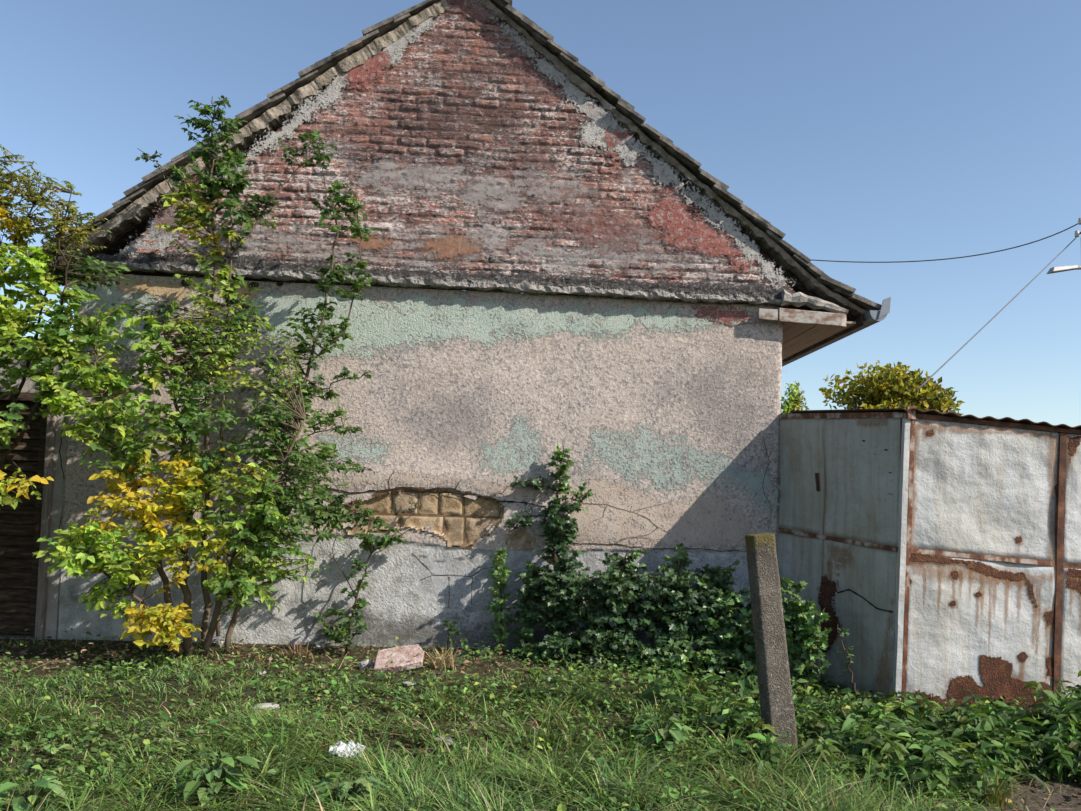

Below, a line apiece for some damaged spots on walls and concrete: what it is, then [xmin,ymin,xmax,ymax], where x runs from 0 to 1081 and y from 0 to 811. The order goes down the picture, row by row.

peeling [114,0,797,289]
crack [310,472,546,510]
flaking render [311,413,548,555]
crack [545,436,772,552]
crack [412,553,493,607]
corrosion [816,574,842,653]
crack [820,583,893,613]
corrosion [909,553,1055,625]
corrosion [1067,568,1081,592]
corrosion [908,652,1053,713]